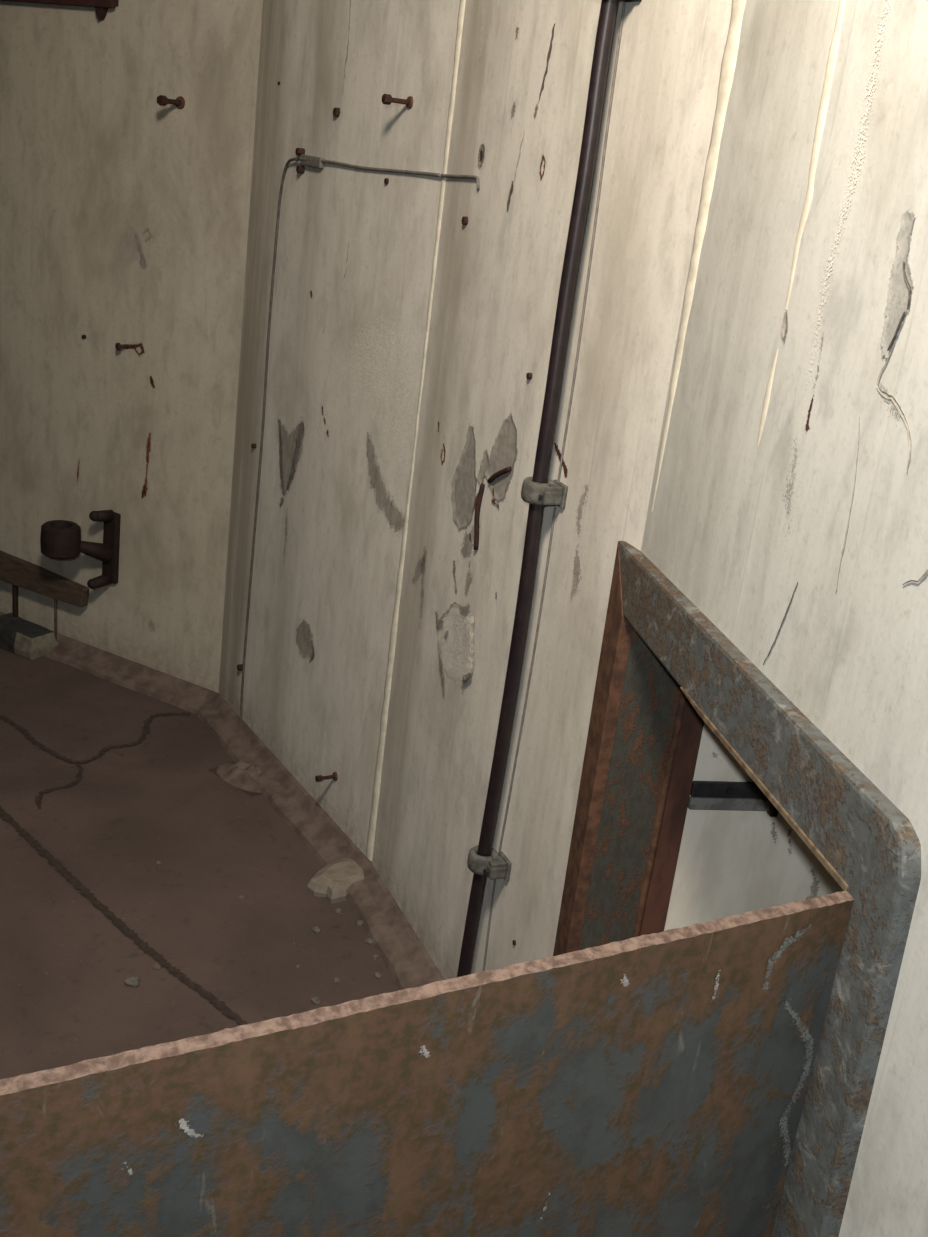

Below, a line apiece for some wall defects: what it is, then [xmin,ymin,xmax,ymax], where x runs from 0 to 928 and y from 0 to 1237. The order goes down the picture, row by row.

spalling [876,207,916,473]
corrosion [141,433,152,498]
spalling [278,418,306,562]
spalling [451,412,519,558]
spalling [296,618,315,663]
crack [0,712,190,809]
corrosion [680,687,849,891]